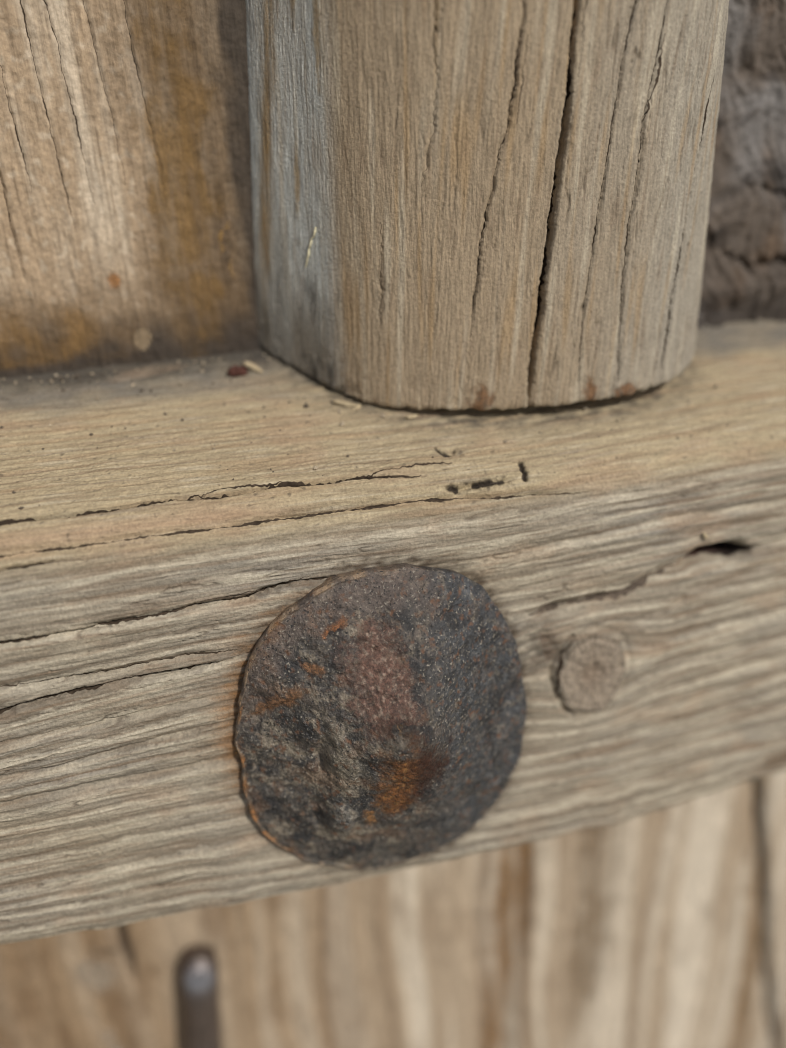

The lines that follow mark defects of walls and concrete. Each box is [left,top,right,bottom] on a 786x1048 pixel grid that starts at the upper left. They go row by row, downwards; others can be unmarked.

crack [0,65,32,192]
crack [20,0,96,232]
crack [471,20,528,335]
crack [561,0,588,129]
crack [529,172,556,355]
crack [0,462,589,572]
crack [529,564,673,615]
rust [227,660,302,723]
rust [346,621,416,735]
rust [367,740,448,822]